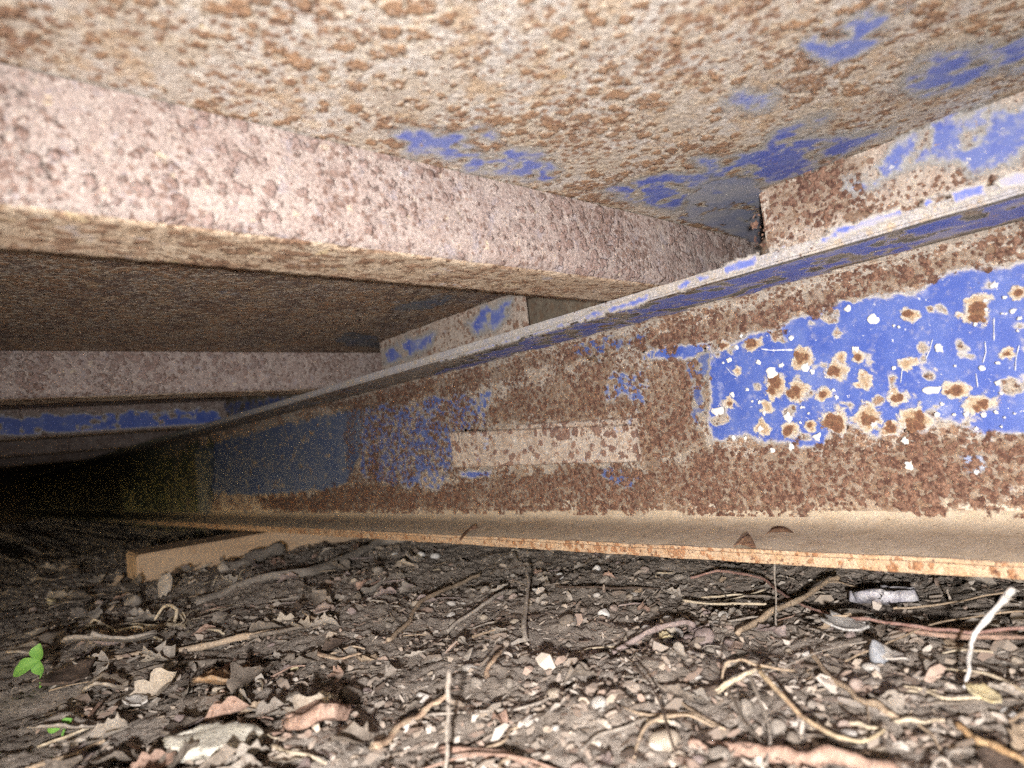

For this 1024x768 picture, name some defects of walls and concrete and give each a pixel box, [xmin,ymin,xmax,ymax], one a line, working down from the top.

peeling [798,5,915,67]
peeling [894,34,1024,99]
peeling [720,87,782,115]
peeling [388,123,564,183]
corrosion [751,157,873,251]
peeling [425,102,1024,453]
peeling [335,331,437,365]
peeling [0,395,297,437]
peeling [199,388,493,497]
corrosion [256,229,1024,541]
corrosion [733,534,756,548]